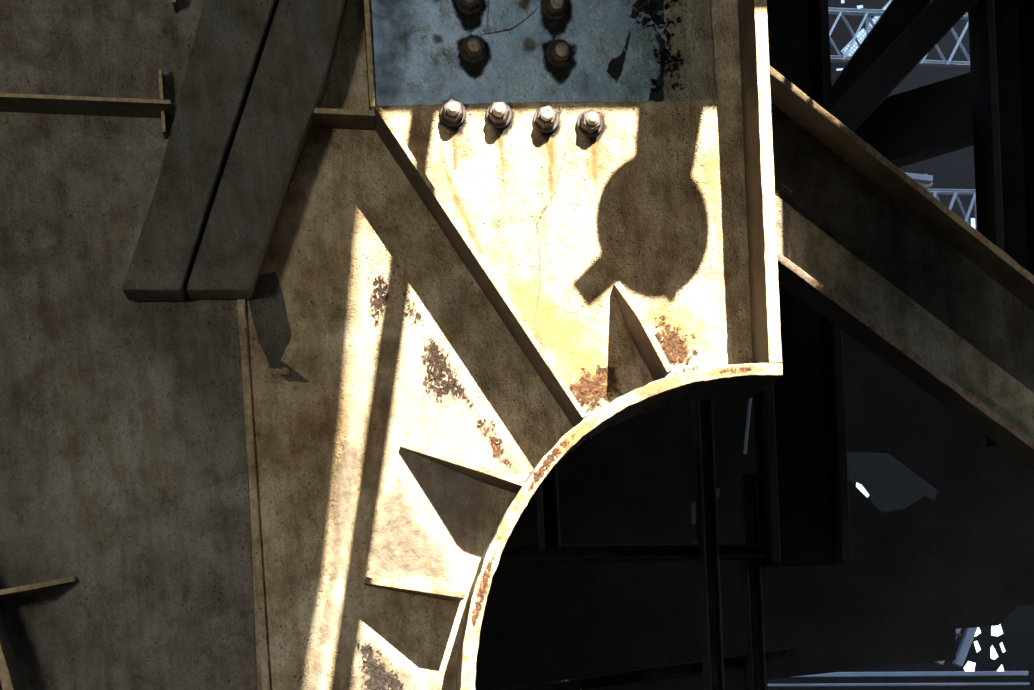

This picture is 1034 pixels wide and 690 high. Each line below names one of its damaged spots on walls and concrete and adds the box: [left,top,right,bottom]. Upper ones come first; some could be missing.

crack [527,130,573,330]
rust [661,307,712,352]
peeling [356,636,404,690]